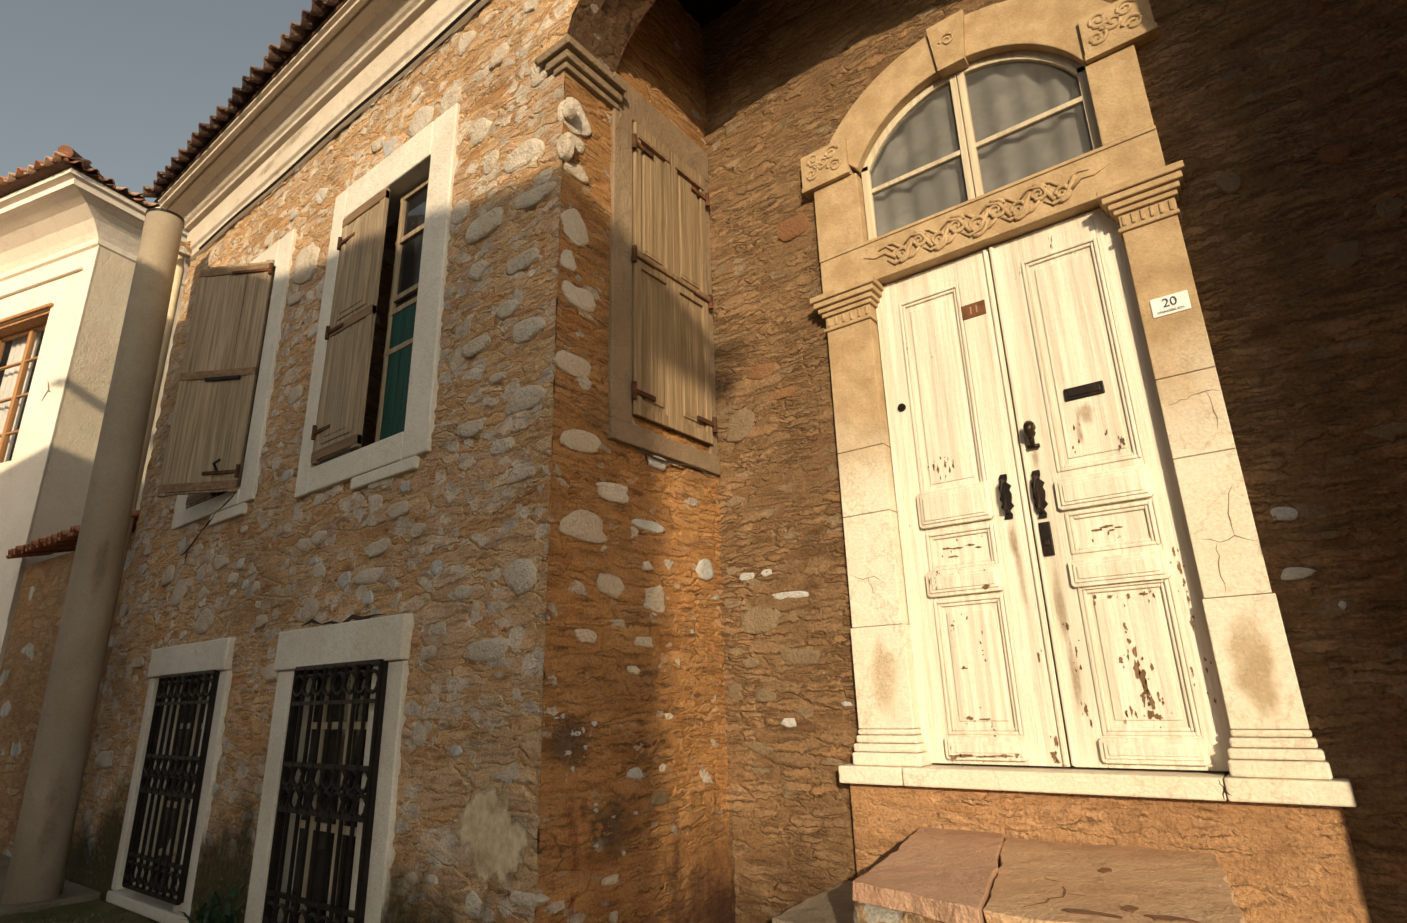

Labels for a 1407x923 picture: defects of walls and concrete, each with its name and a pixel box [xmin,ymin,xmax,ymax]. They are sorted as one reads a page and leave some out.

crack [1171,389,1220,428]
crack [1206,485,1254,592]
peeling [1170,547,1194,631]
peeling [1094,588,1172,728]
peeling [949,747,1020,767]